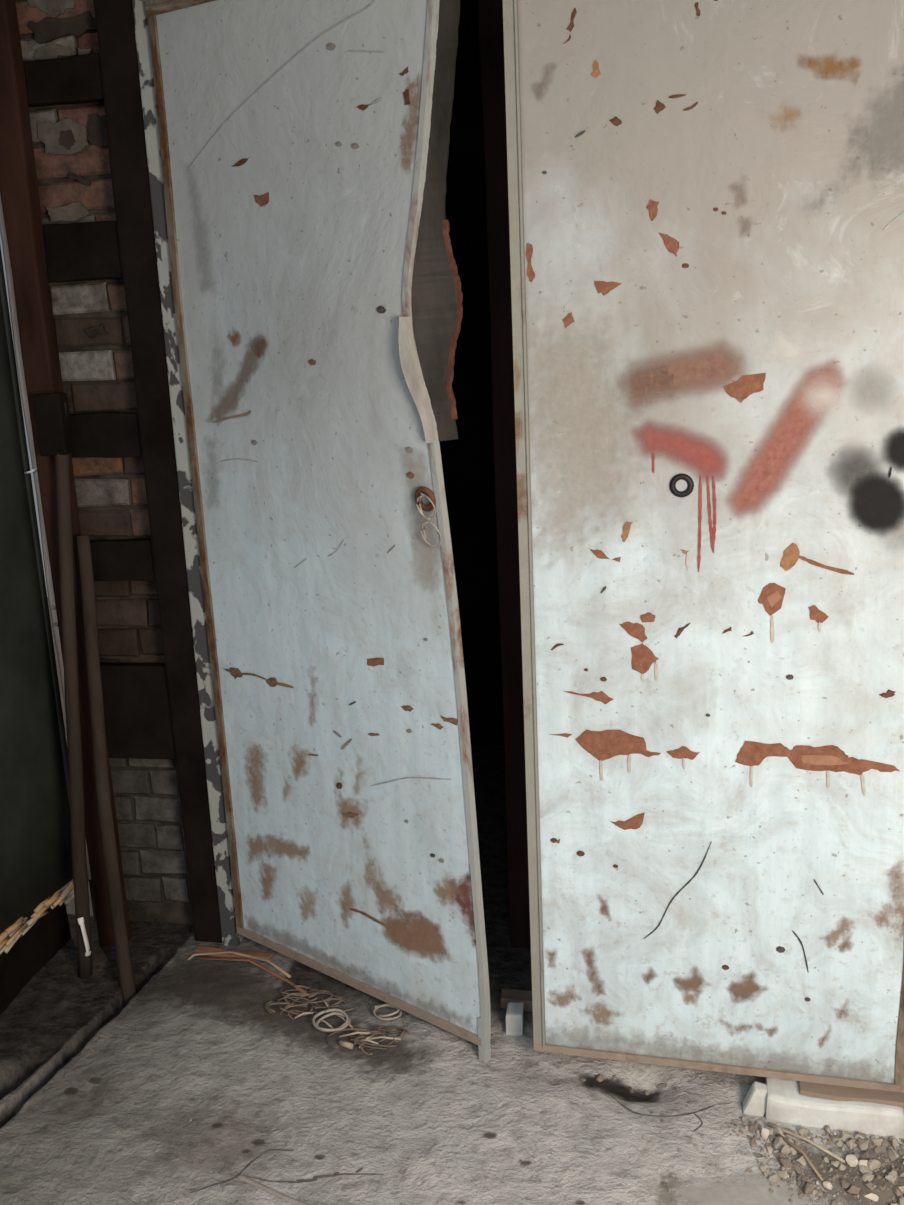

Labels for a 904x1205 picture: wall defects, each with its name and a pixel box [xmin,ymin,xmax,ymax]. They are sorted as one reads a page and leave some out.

spalling [27,0,97,60]
rust [808,58,858,77]
flaking render [38,114,108,155]
flaking render [46,202,91,222]
rust [339,774,361,826]
rust [341,862,447,957]
rust [435,874,476,945]